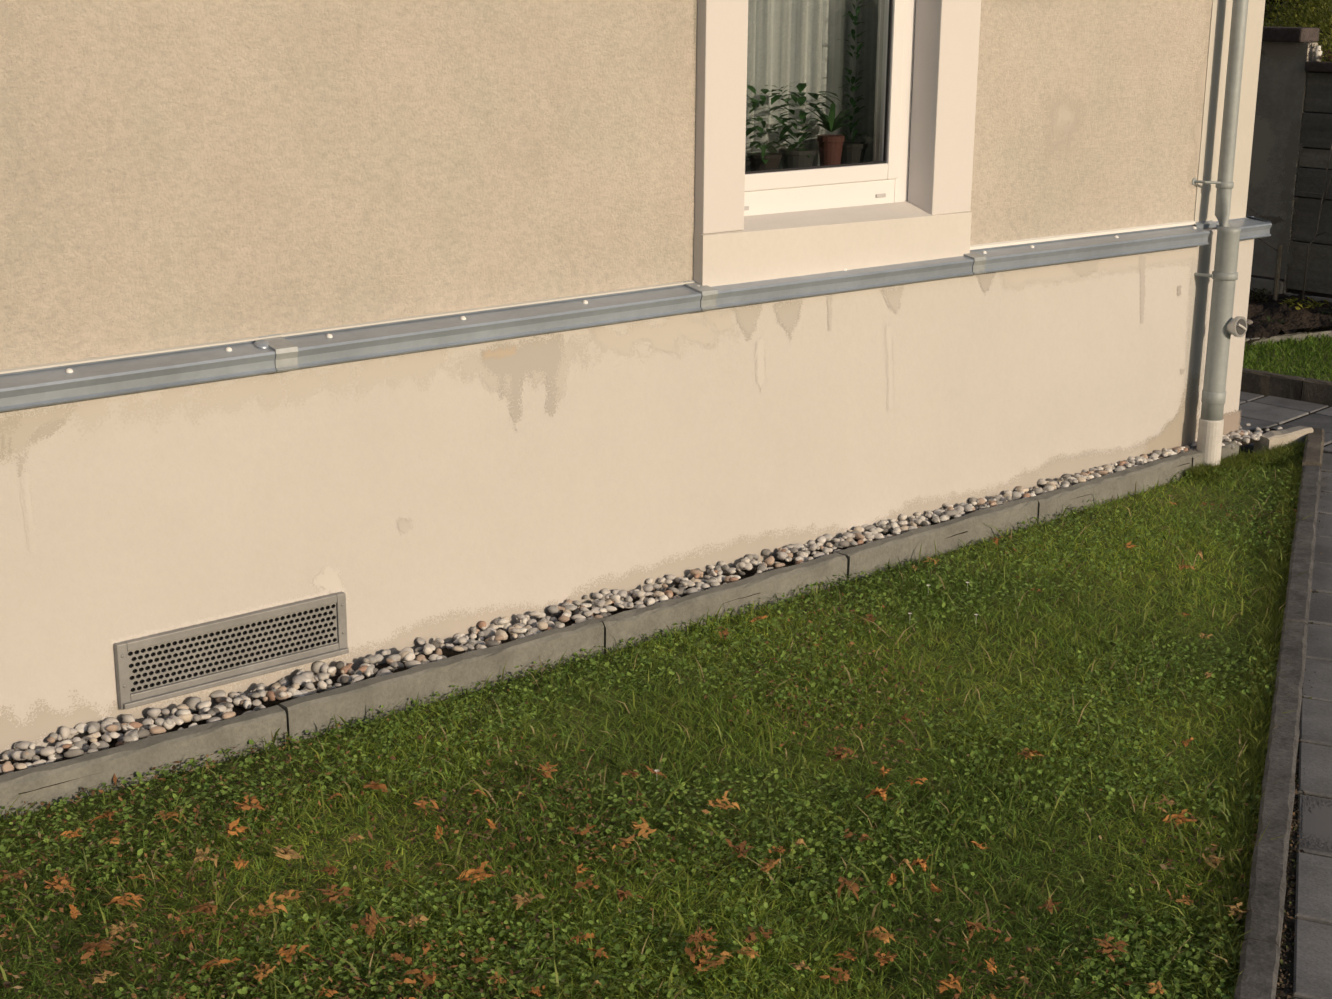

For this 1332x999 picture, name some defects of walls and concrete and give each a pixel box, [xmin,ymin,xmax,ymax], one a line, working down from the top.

damp [0,246,1211,760]